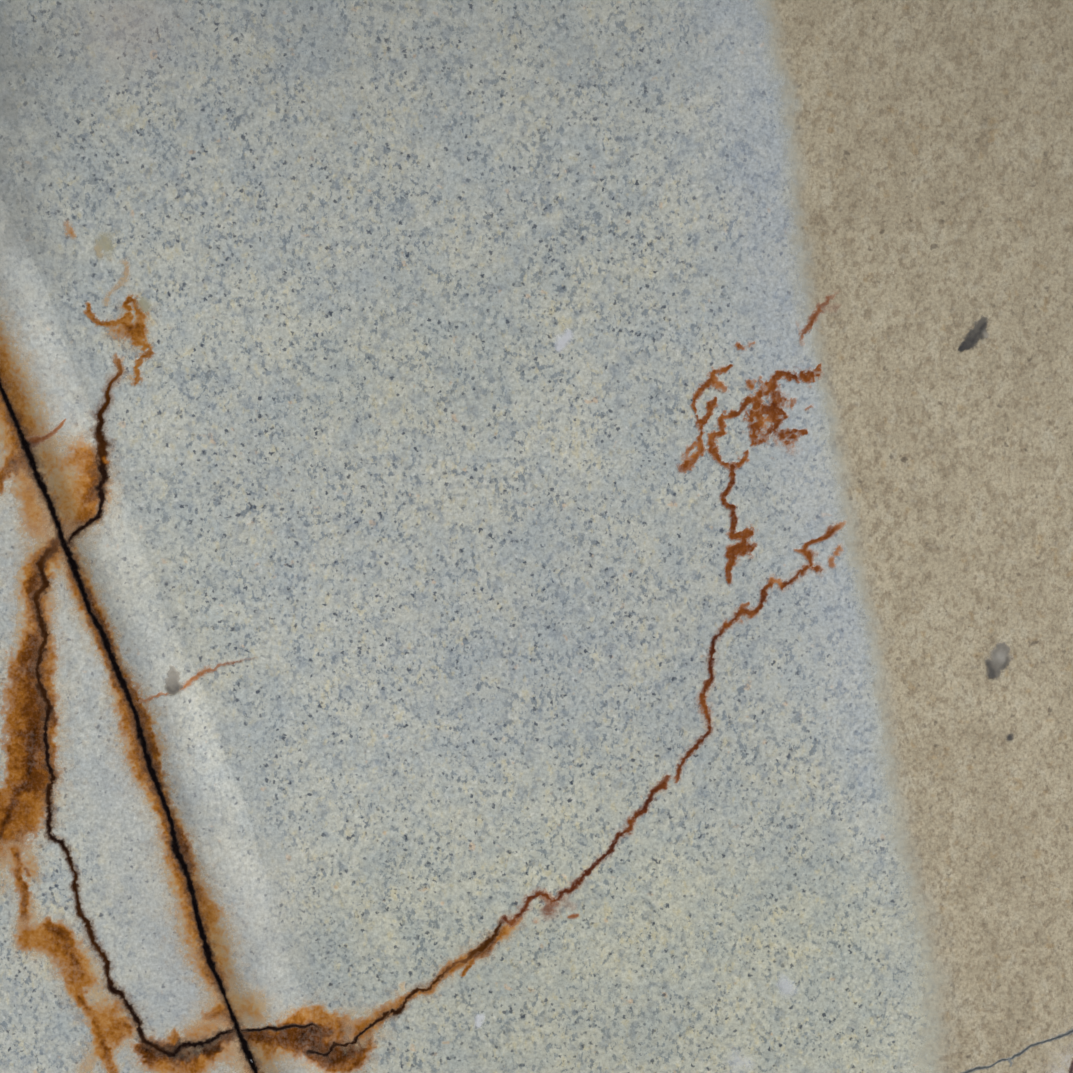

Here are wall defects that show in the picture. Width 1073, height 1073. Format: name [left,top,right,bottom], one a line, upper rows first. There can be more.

rust [83,262,154,386]
rust [799,295,834,340]
rust [677,364,822,584]
water stain [764,0,1073,1073]
rust [0,320,523,1073]
crack [0,358,846,1073]
crack [962,1029,1073,1073]